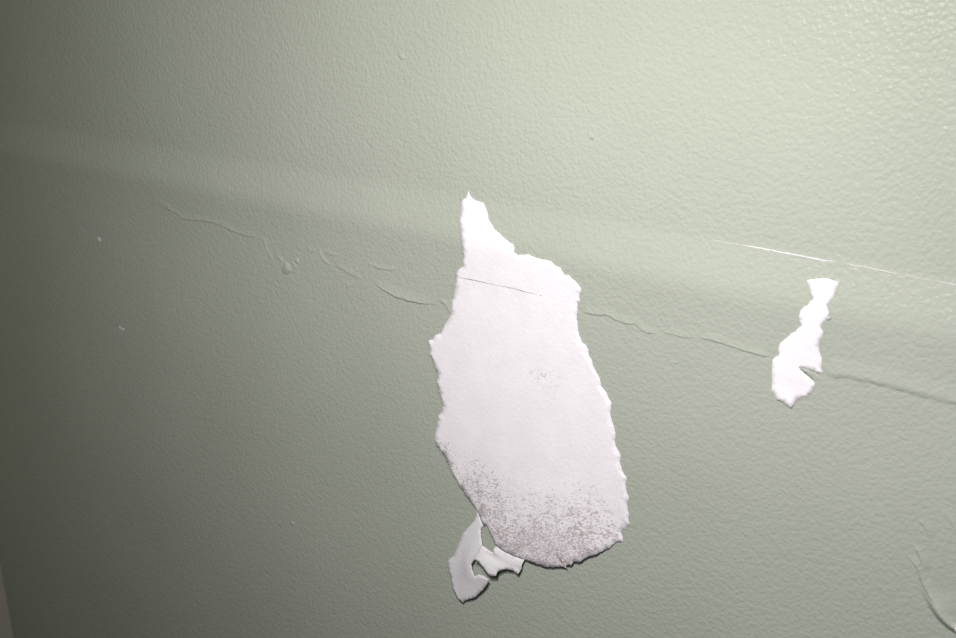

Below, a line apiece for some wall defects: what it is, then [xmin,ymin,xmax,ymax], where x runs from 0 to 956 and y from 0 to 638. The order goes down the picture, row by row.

peeling [427,190,631,603]
crack [459,277,769,357]
peeling [770,276,841,408]
crack [714,240,956,285]